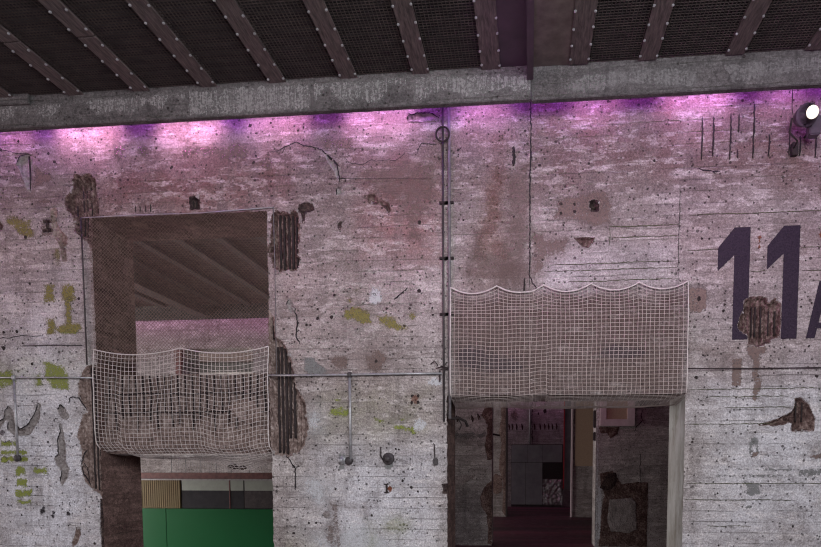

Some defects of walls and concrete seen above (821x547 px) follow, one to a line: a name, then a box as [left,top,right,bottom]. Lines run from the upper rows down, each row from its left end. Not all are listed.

crack [271,142,438,183]
spalling [42,173,100,262]
spalling [267,202,315,275]
spalling [737,296,782,348]
spalling [54,404,70,485]
spalling [77,365,105,547]
spalling [268,310,309,458]
spalling [758,397,816,433]
spalling [72,526,81,547]